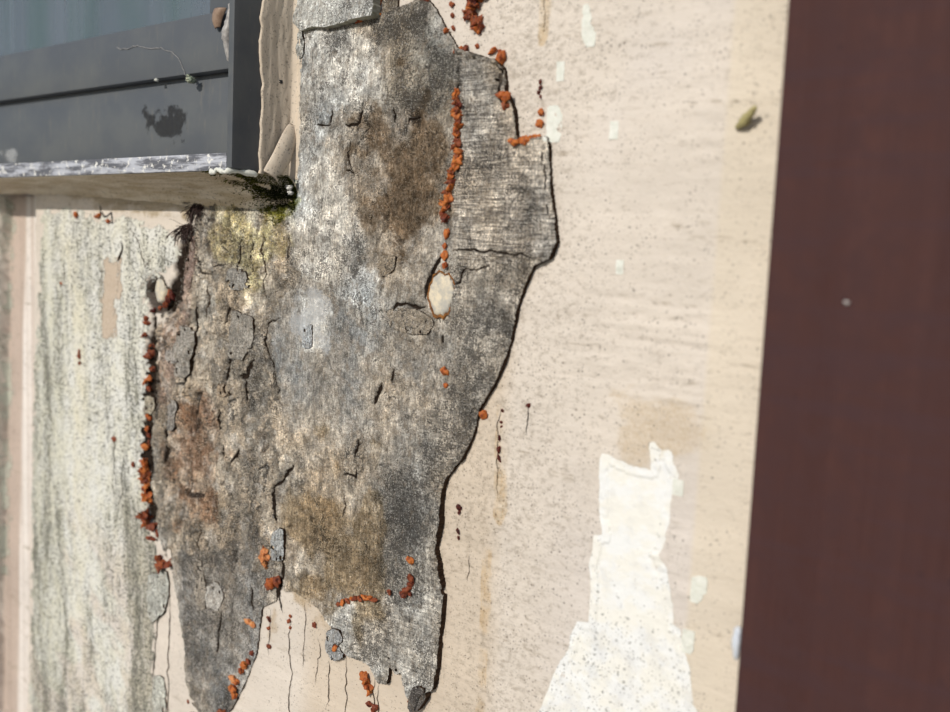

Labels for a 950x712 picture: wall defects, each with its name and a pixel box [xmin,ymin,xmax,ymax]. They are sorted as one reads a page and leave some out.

leakage [165,202,206,251]
crack [393,248,535,309]
crack [113,227,290,527]
crack [374,368,395,404]
crack [345,439,359,479]
crack [271,465,294,523]
peeling [539,442,698,712]
peeling [690,576,708,604]
crack [153,595,171,709]
crack [215,613,223,652]
crack [251,560,347,712]